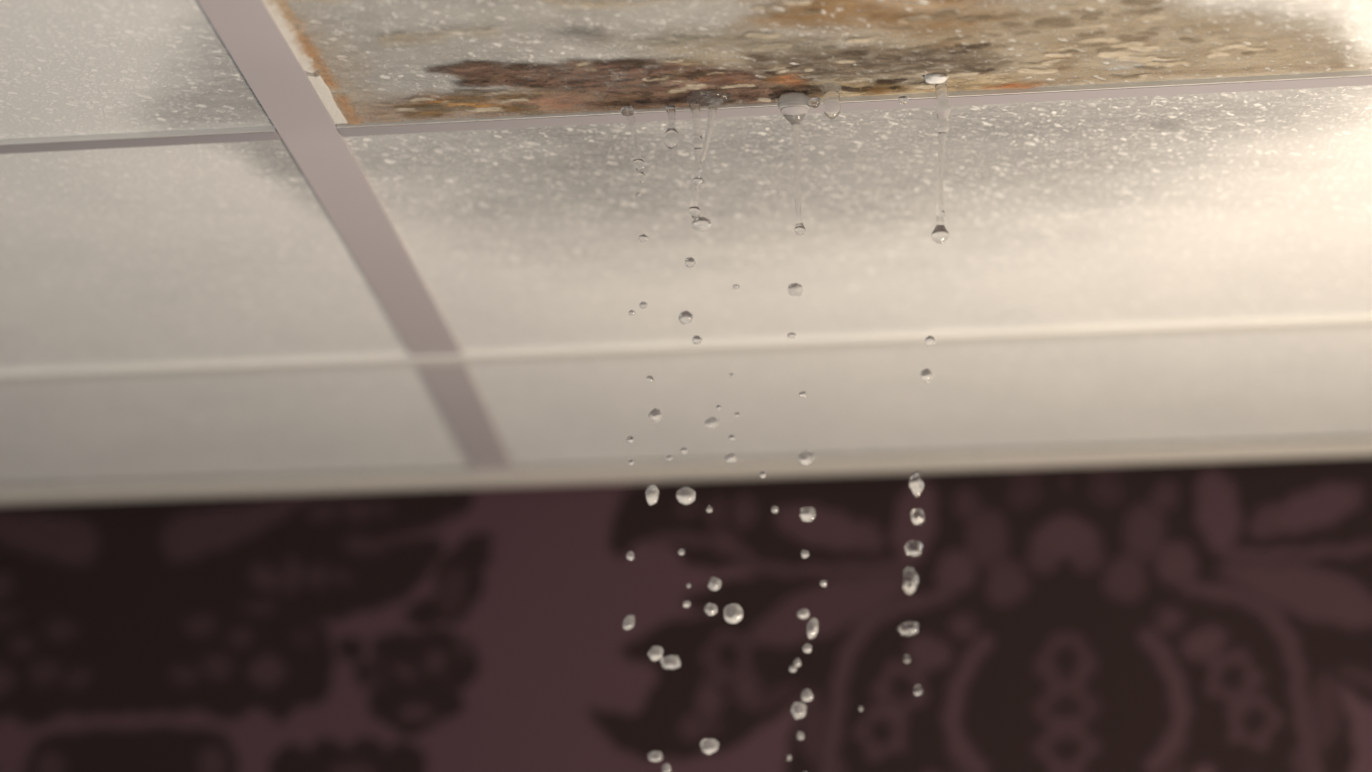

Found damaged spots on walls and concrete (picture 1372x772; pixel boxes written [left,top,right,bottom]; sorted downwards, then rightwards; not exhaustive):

leakage [279,0,1325,122]